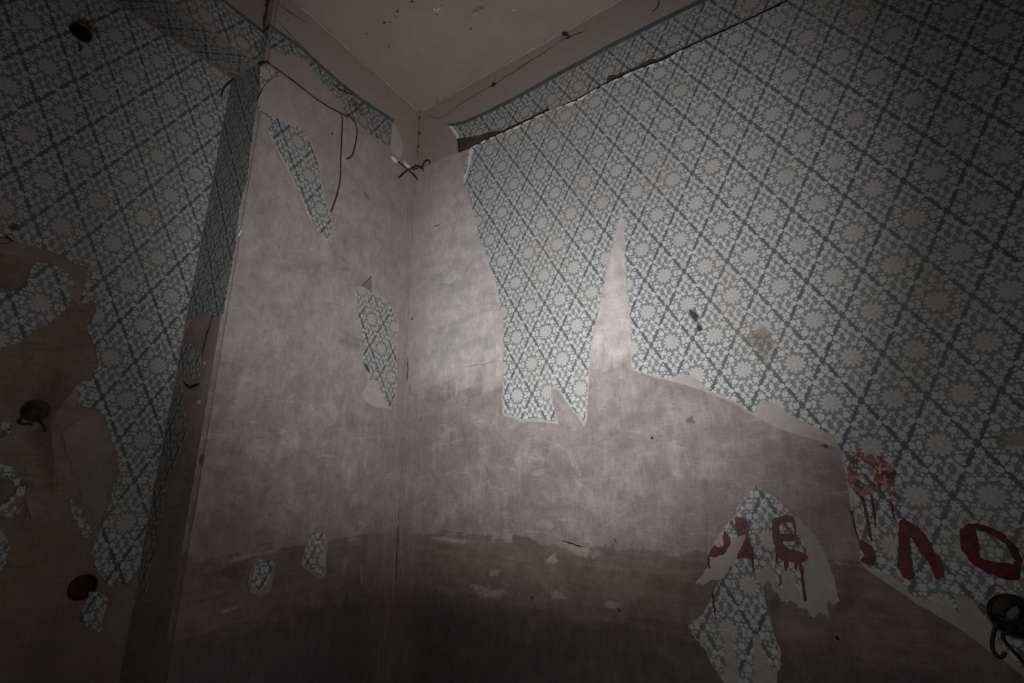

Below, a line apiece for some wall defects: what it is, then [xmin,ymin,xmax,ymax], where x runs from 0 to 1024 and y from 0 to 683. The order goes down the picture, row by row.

crack [417,30,586,160]